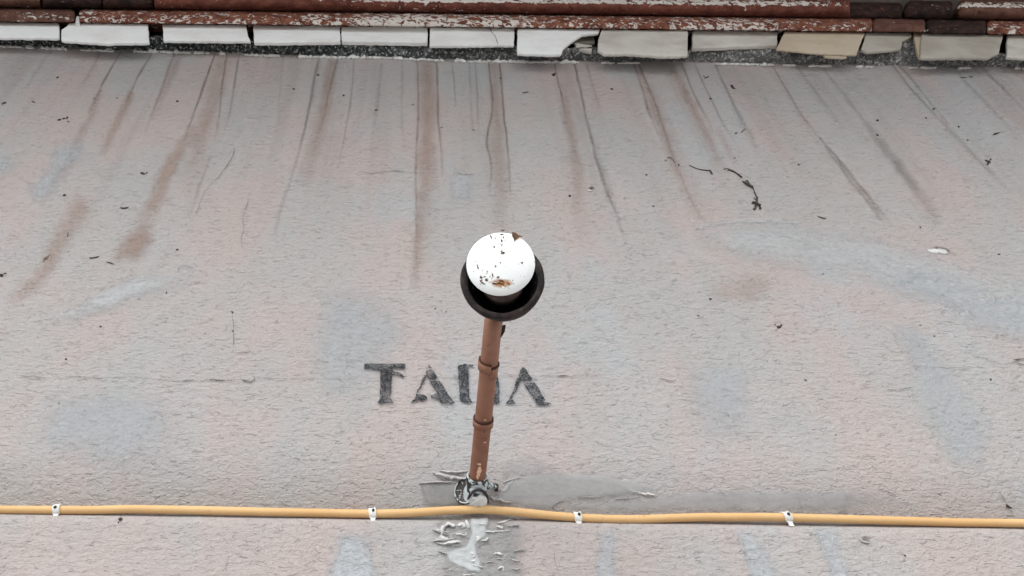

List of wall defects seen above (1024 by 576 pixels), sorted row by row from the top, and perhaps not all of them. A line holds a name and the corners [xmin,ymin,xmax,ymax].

flaking render [433,514,524,576]